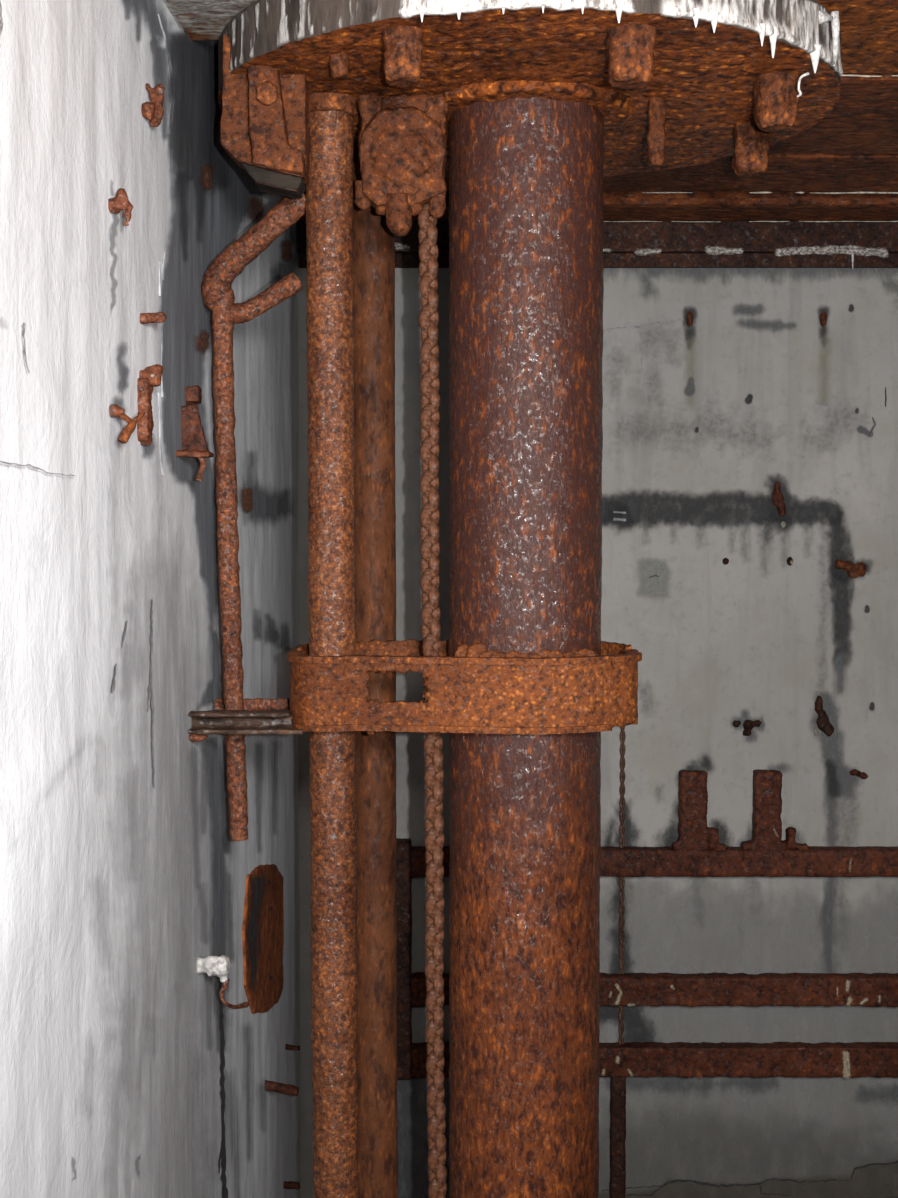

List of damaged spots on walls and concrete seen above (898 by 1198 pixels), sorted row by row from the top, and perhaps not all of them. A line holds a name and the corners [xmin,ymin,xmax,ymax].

crack [0,2,8,35]
damp [398,0,636,23]
damp [661,0,898,98]
rust [247,196,265,223]
rust [684,308,696,348]
rust [819,308,829,344]
crack [0,461,75,476]
damp [602,476,869,847]